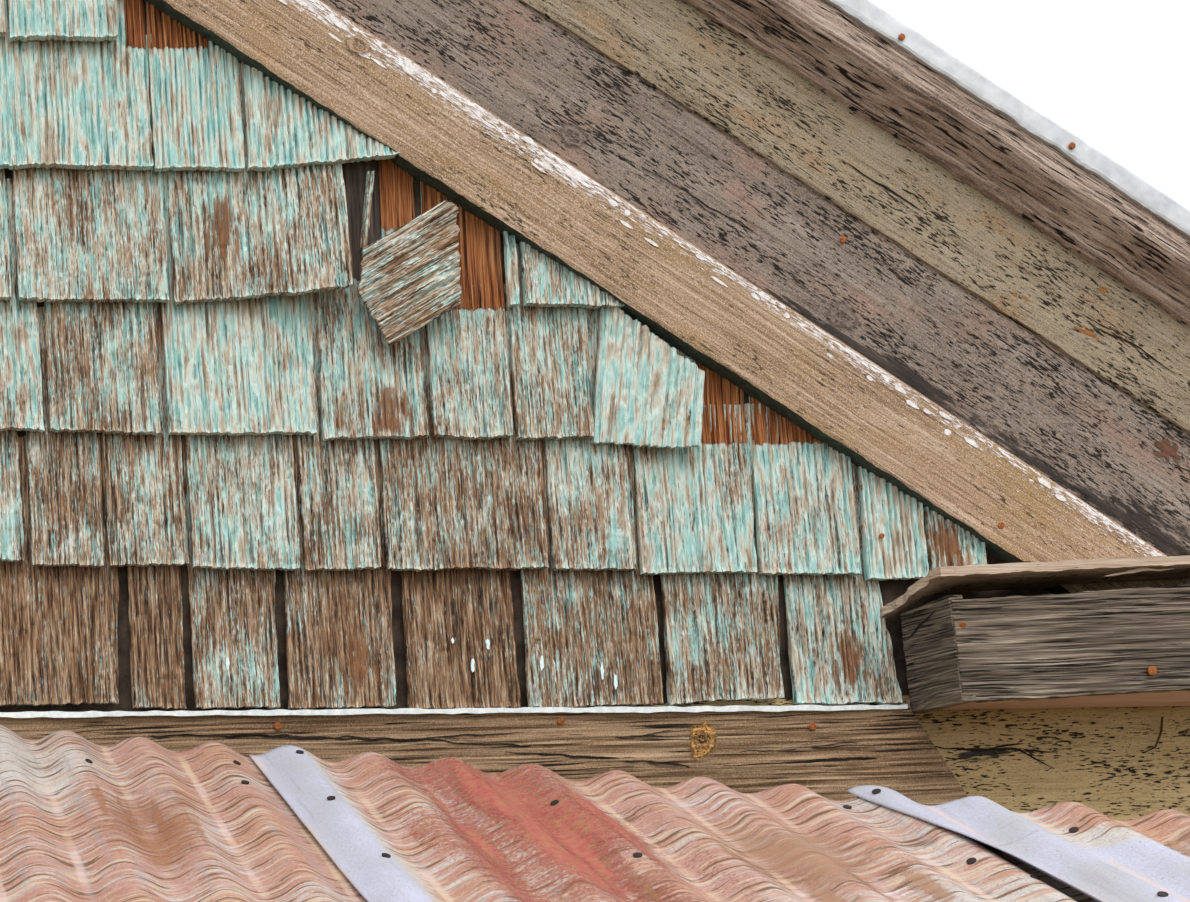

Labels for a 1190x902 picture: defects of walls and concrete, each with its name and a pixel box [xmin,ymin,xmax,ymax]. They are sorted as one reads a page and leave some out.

peeling [124,0,208,50]
peeling [268,0,1165,556]